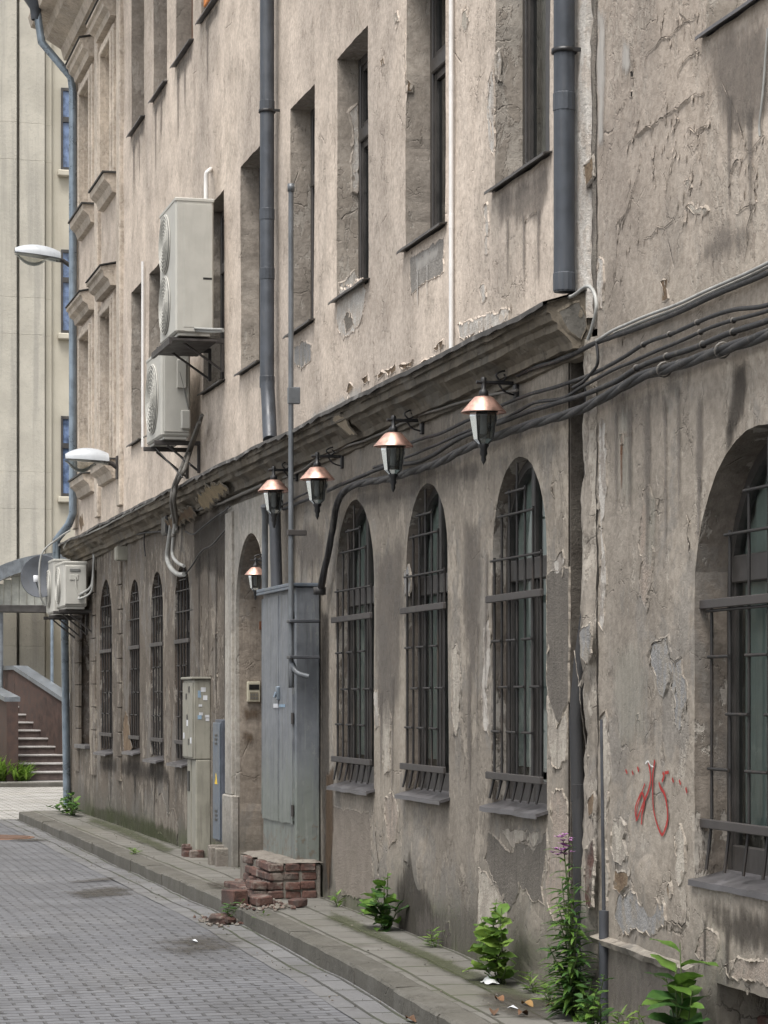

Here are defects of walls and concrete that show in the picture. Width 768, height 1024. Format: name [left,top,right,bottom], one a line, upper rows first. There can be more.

crack [595,7,765,327]
flaking render [336,269,367,342]
flaking render [457,282,511,341]
flaking render [546,417,626,774]
flaking render [648,634,688,733]
water stain [103,761,169,810]
flaking render [477,709,687,938]
flaking render [694,927,768,995]